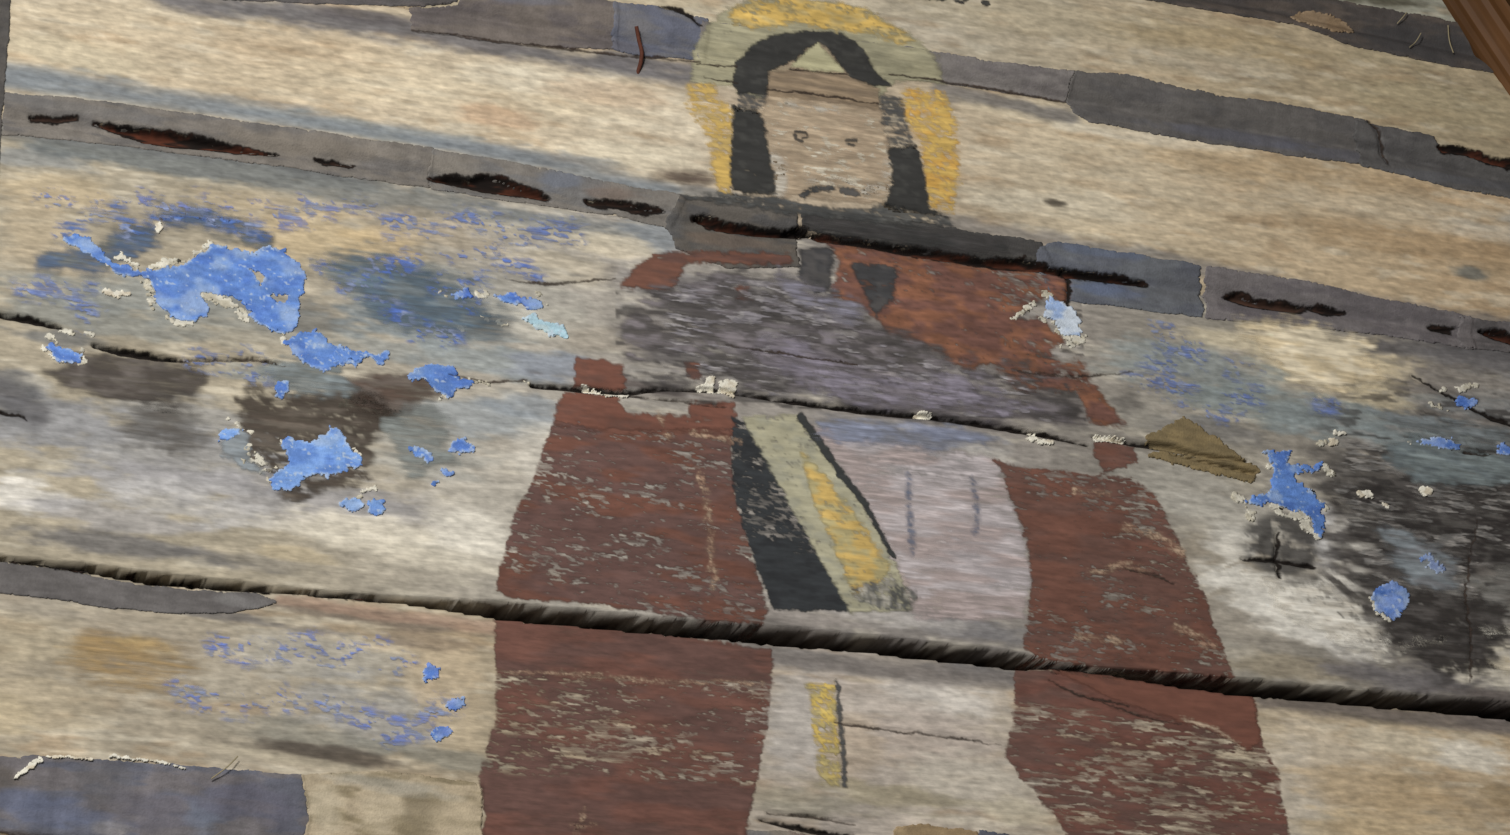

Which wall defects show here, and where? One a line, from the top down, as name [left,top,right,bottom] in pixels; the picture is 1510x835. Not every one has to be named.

crack [0,314,285,367]
peeling [63,233,390,373]
crack [518,277,615,285]
peeling [1010,290,1088,348]
peeling [218,416,363,491]
crack [462,376,1183,455]
peeling [1231,429,1347,540]
water stain [1331,484,1510,573]
crack [125,572,380,603]
peeling [1264,577,1446,664]
water stain [1384,581,1509,683]
crack [835,722,982,742]